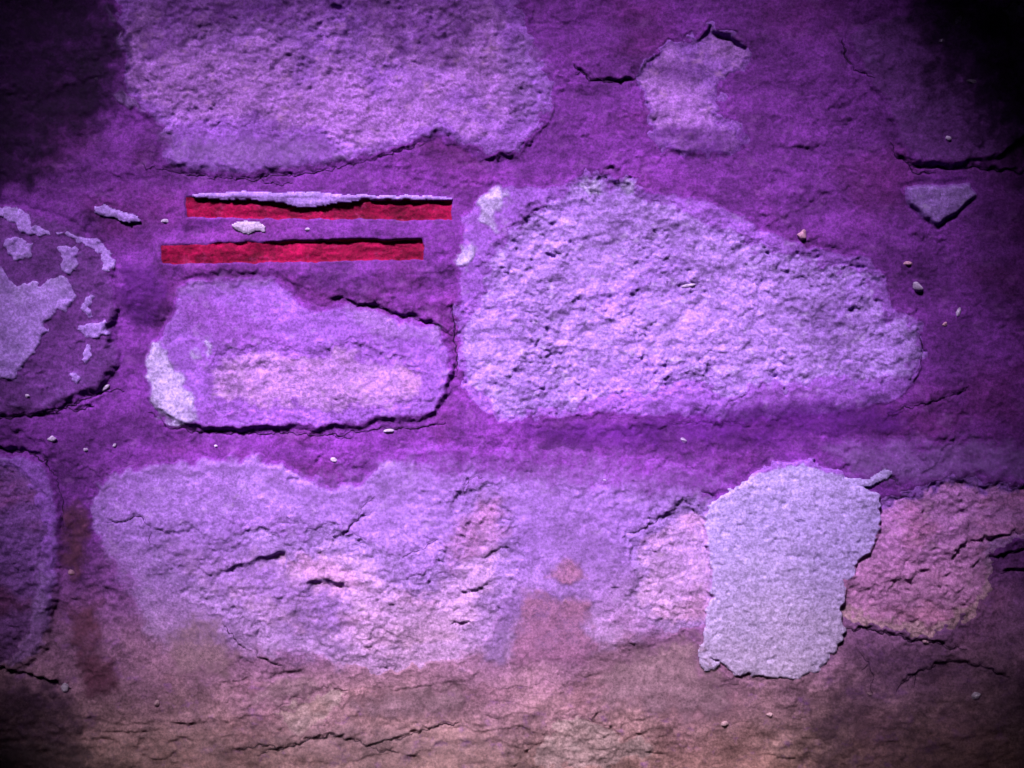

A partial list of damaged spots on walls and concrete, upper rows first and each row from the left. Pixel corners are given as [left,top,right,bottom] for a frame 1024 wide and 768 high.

crack [574,66,635,83]
spalling [636,21,752,159]
flaking render [94,204,141,223]
peeling [0,201,116,380]
crack [347,299,458,370]
peeling [843,469,892,487]
crack [402,475,485,558]
crack [956,532,1024,573]
peeling [698,647,720,671]